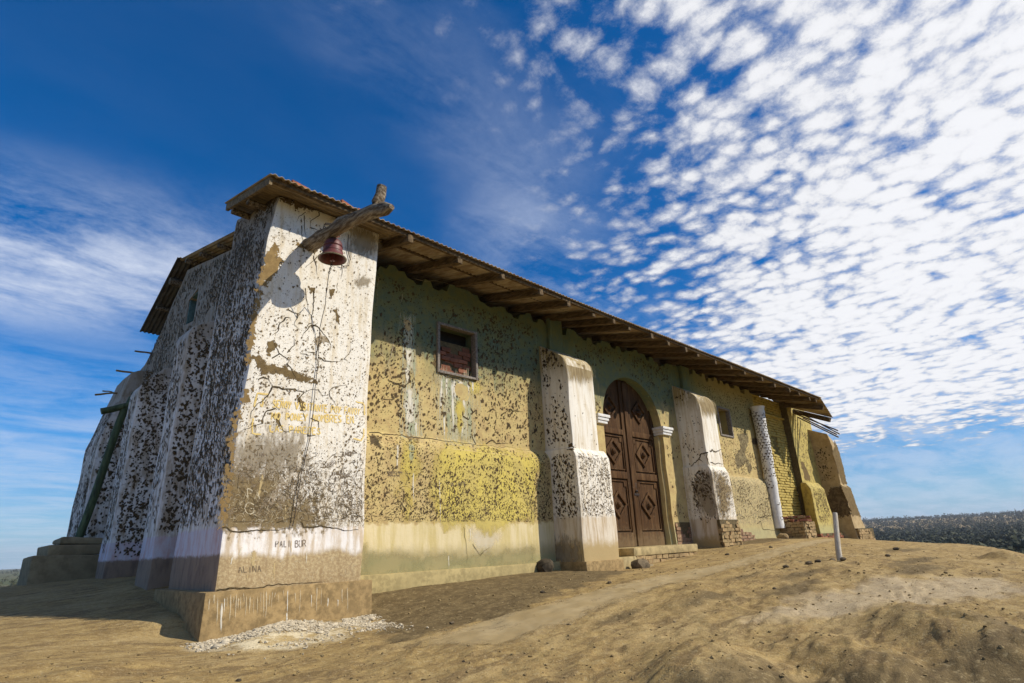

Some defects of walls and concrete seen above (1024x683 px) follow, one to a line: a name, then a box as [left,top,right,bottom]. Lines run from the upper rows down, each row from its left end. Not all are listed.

crack [242,212,351,436]
flaking render [67,196,612,557]
leakage [397,317,421,465]
leakage [436,369,481,446]
crack [688,449,724,476]
leakage [209,590,329,627]